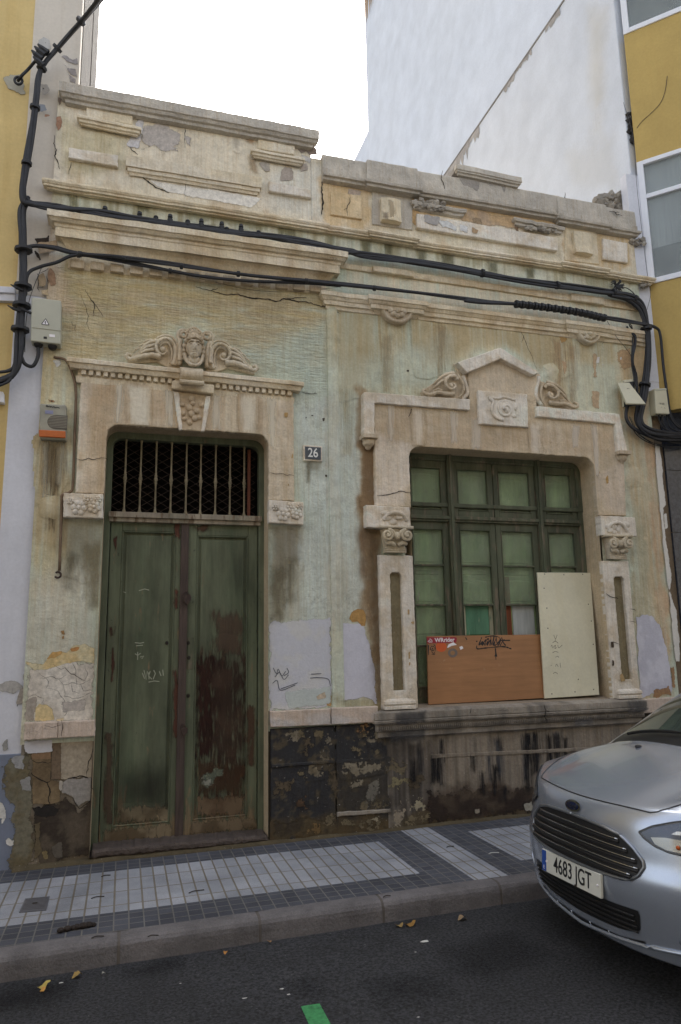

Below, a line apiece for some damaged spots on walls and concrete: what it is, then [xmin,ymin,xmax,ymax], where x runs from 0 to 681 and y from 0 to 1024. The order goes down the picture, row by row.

peeling [127,120,191,152]
peeling [147,178,260,208]
crack [197,287,339,313]
damp [268,520,309,616]
peeling [653,444,680,698]
peeling [0,630,95,722]
corrosion [194,609,255,798]
spalling [24,740,93,864]
damp [391,711,568,823]